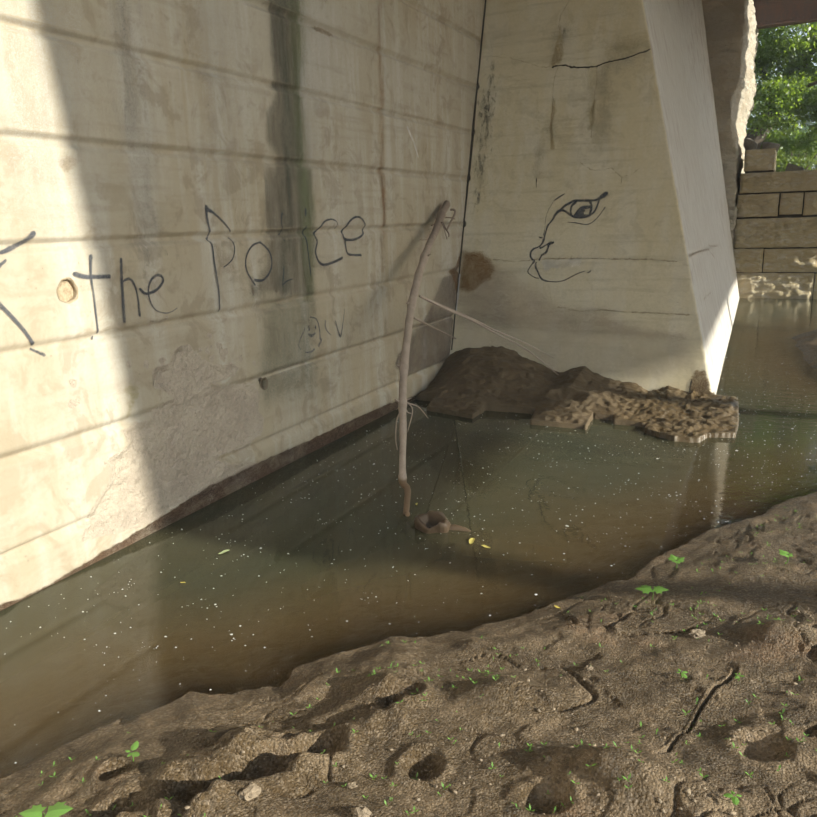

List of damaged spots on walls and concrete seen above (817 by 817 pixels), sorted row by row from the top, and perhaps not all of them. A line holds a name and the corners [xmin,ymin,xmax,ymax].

crack [485,46,650,137]
damp [255,0,328,413]
spalling [82,332,264,542]